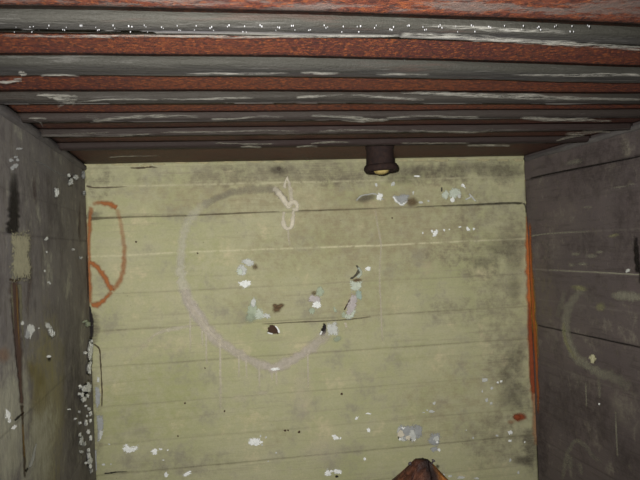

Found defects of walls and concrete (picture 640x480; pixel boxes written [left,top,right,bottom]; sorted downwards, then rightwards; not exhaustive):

peeling [393,191,430,205]
peeling [441,184,476,202]
peeling [236,259,257,289]
spalling [5,182,55,476]
peeling [247,297,283,334]
peeling [309,286,324,314]
peeling [320,265,370,341]
rust [526,226,539,437]
peeling [68,339,112,474]